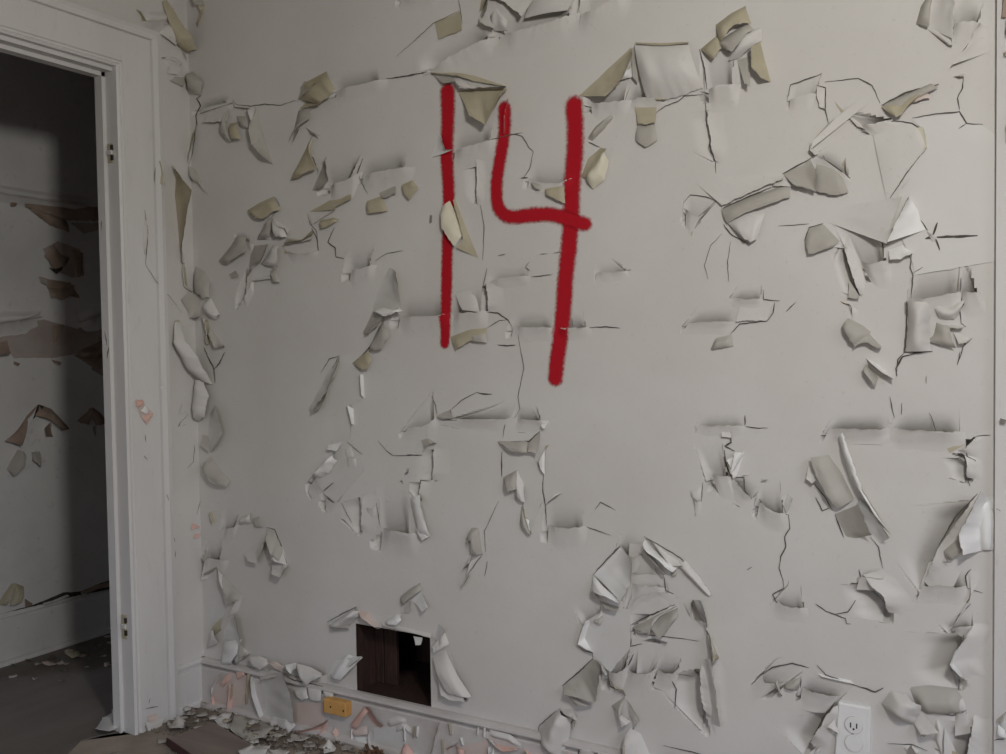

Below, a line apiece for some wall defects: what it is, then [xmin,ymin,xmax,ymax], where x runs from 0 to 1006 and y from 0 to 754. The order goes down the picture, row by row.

peeling [516,46,703,203]
crack [677,94,729,169]
crack [914,38,983,128]
peeling [0,320,103,375]
crack [401,388,490,448]
crack [483,252,617,417]
crack [594,253,630,283]
peeling [498,422,728,754]
crack [773,514,790,594]
peeling [768,433,915,624]
spalling [145,583,471,754]
peeling [745,604,1006,754]